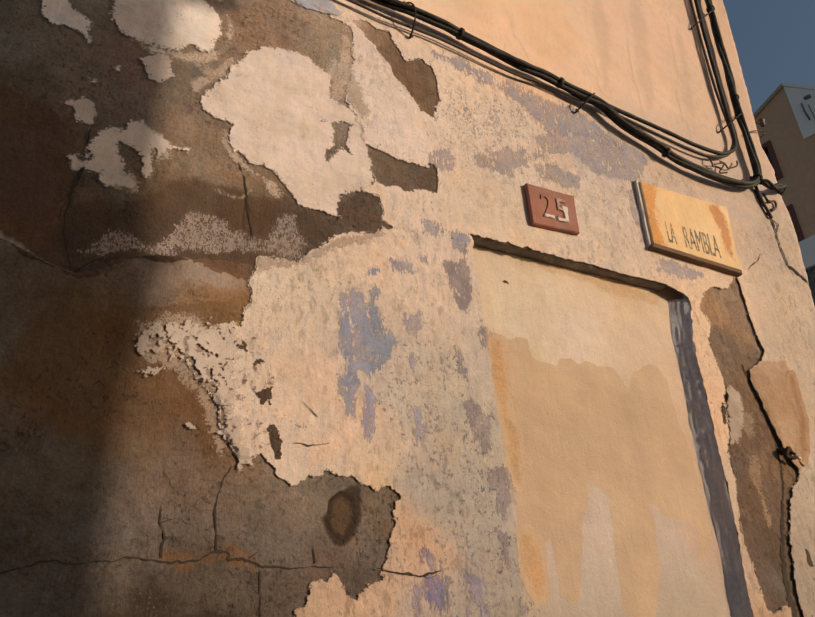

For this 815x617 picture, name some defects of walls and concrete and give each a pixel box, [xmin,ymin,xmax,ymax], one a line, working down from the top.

crack [59,127,111,278]
leakage [0,66,389,457]
spalling [0,0,647,281]
crack [754,189,809,283]
crack [0,467,334,617]
leakage [46,556,289,617]
leakage [317,480,366,551]
crack [377,568,441,578]
leakage [505,335,713,617]
spalling [700,277,813,617]